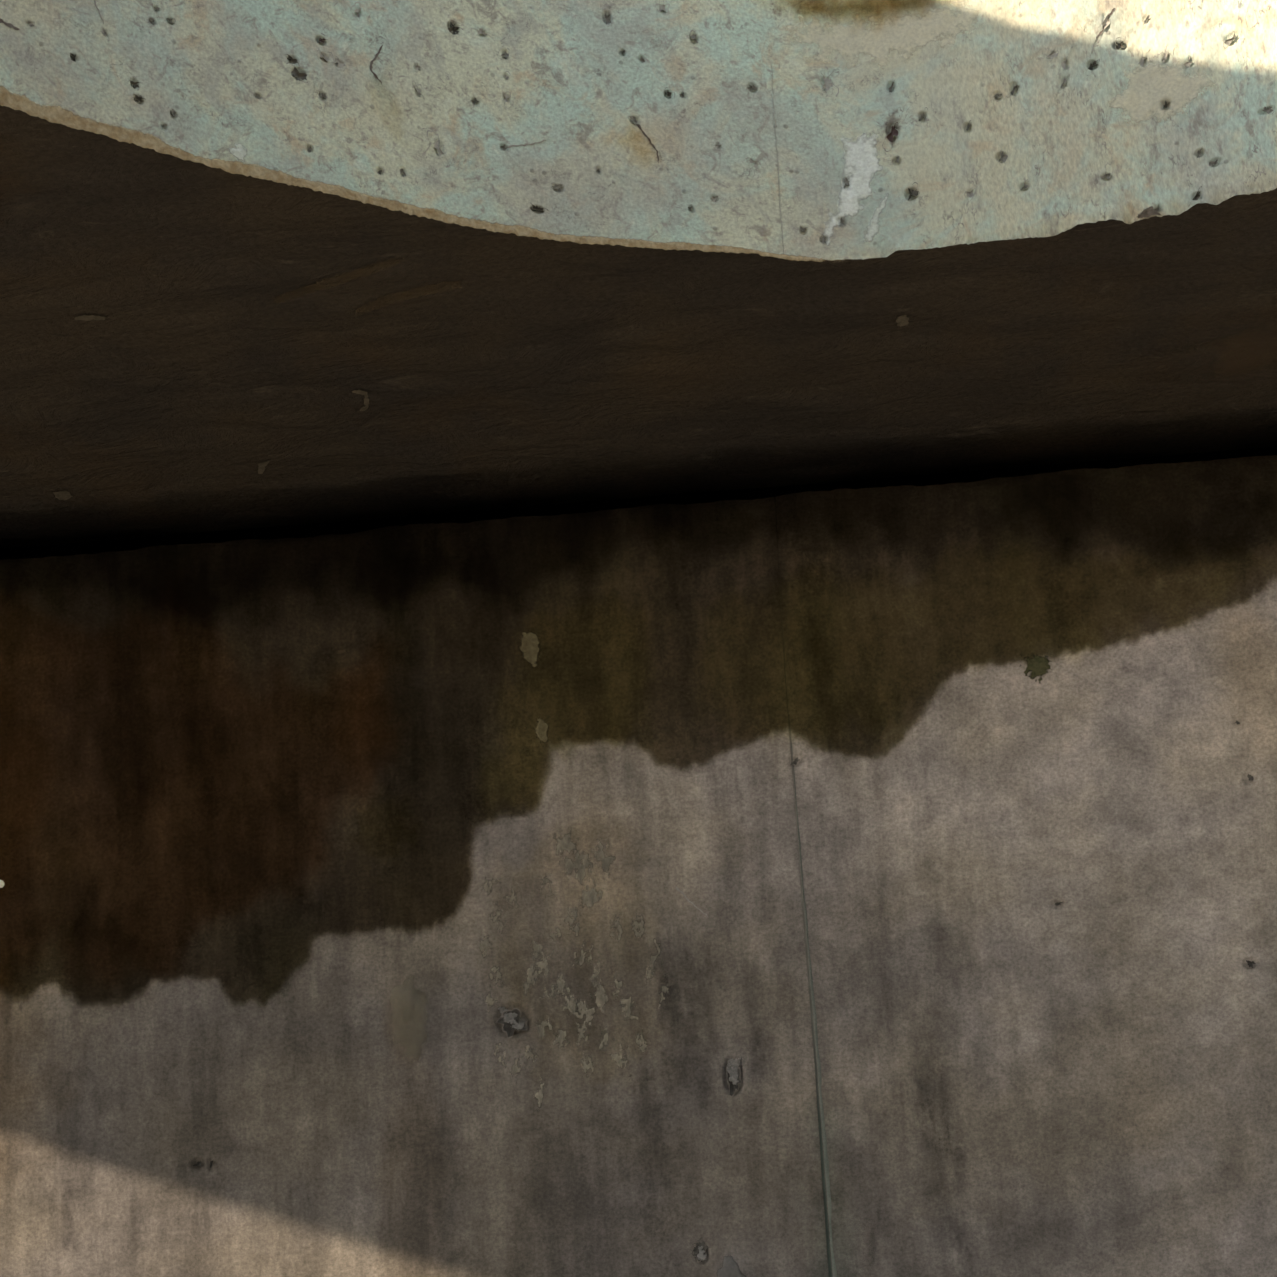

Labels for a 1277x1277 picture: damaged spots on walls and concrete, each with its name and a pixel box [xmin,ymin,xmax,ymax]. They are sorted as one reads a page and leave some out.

leakage [0,447,1277,1002]